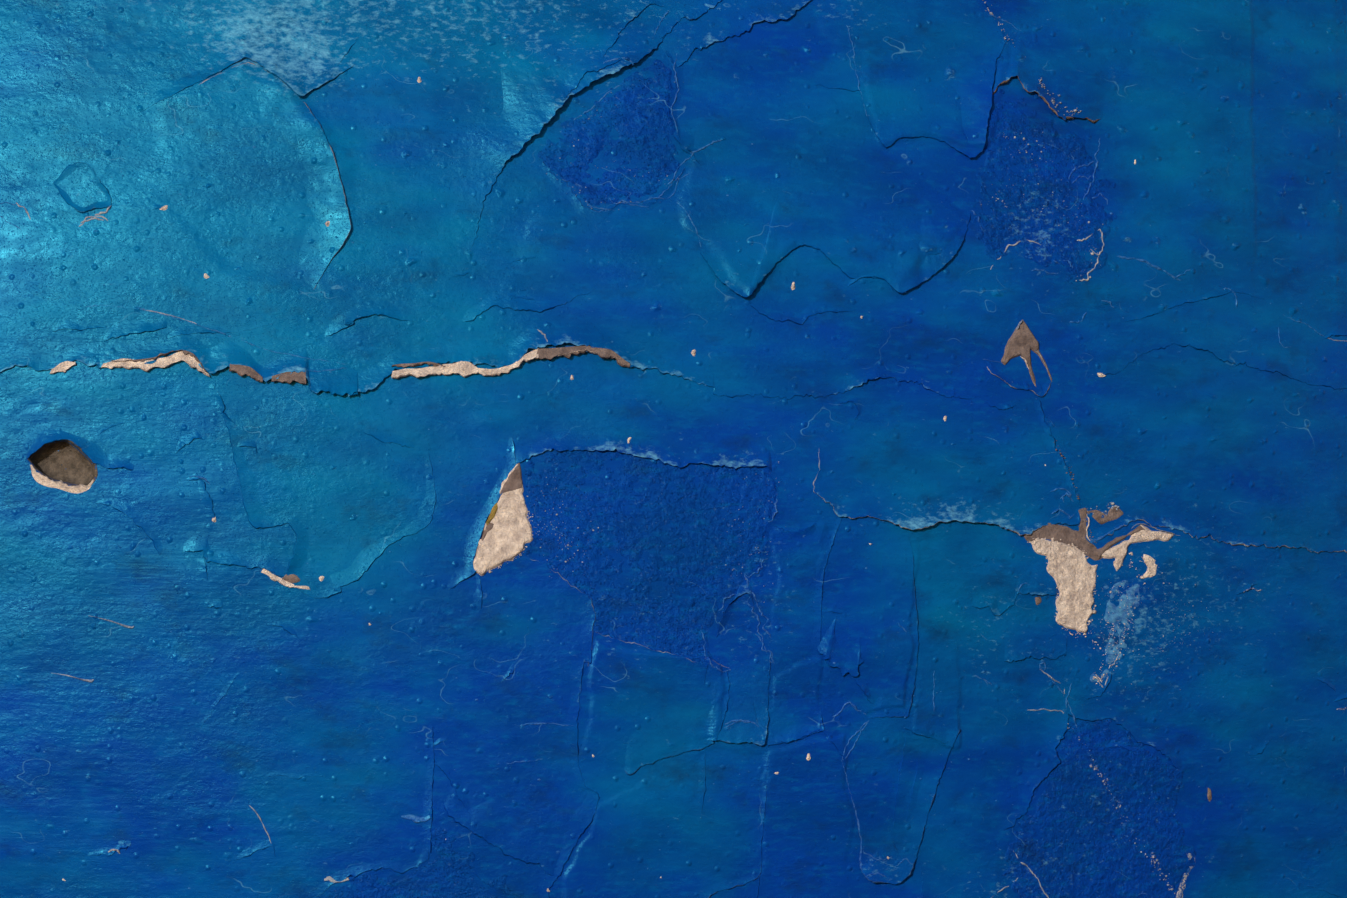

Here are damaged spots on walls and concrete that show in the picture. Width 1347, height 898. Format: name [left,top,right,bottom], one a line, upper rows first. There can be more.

peeling [441,0,665,253]
crack [0,316,982,453]
spalling [984,319,1052,410]
crack [1278,314,1347,348]
spalling [26,429,134,493]
peeling [447,429,786,686]
crack [699,469,875,741]
peeling [813,447,1180,649]
crack [1030,662,1077,727]
peeling [1001,704,1196,898]
crack [696,863,762,898]
crack [986,853,1049,898]